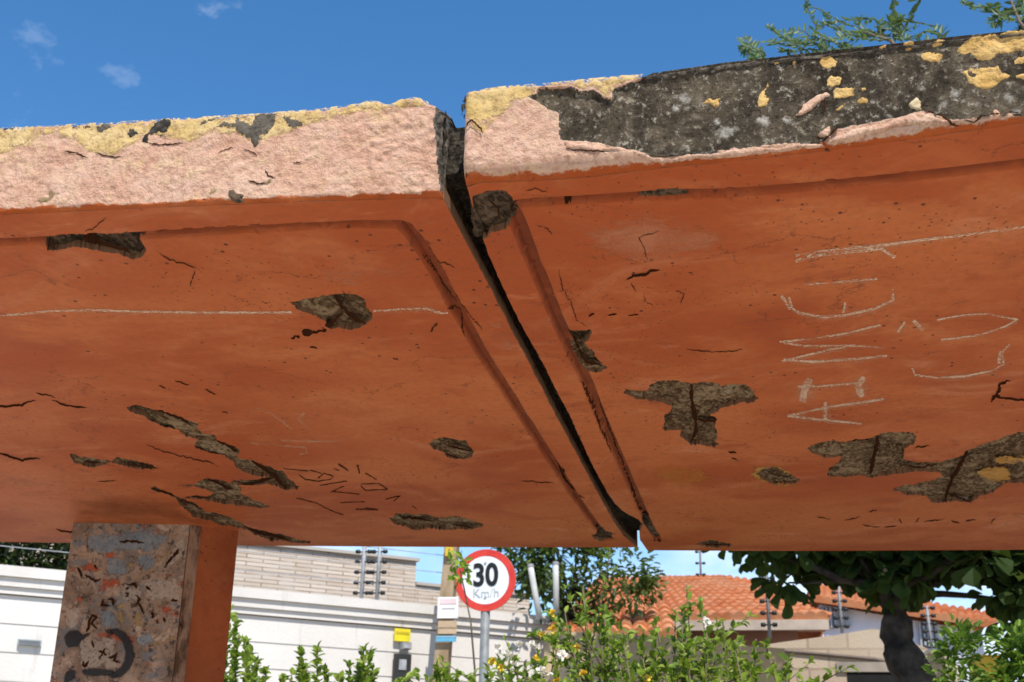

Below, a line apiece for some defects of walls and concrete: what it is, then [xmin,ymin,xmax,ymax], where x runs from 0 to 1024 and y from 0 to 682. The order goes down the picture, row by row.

peeling [0,97,429,155]
crack [568,146,608,154]
spalling [465,30,1024,163]
spalling [43,231,145,254]
crack [423,247,482,336]
crack [559,231,660,324]
spalling [626,380,756,444]
crack [991,380,1024,403]
spalling [131,405,305,541]
crack [524,460,583,498]
crack [580,381,644,519]
spalling [809,431,1024,502]